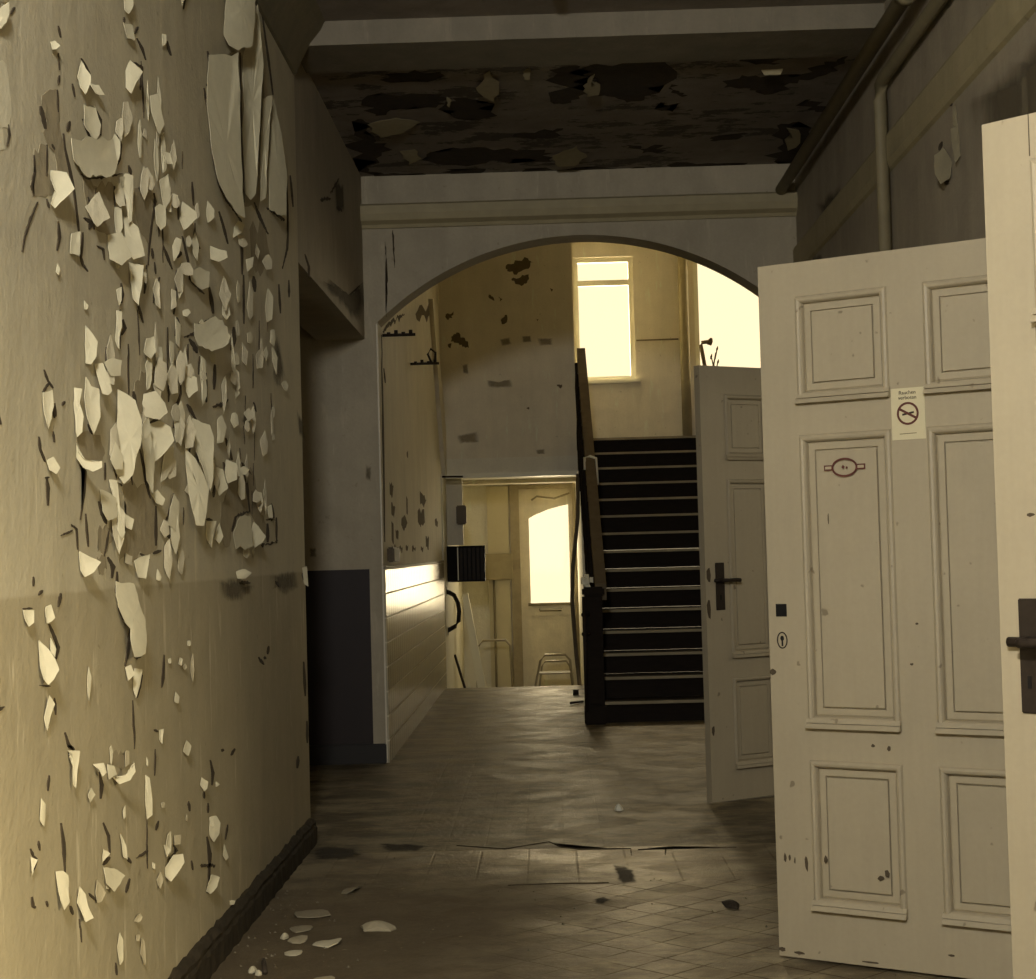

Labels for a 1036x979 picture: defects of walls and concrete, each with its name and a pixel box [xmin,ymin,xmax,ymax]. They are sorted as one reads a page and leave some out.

peeling [0,0,16,29]
peeling [0,60,12,150]
flaking render [345,70,615,176]
flaking render [546,62,687,112]
flaking render [723,56,848,95]
flaking render [764,122,811,164]
flaking render [506,257,531,286]
flaking render [381,304,438,553]
flaking render [275,566,308,591]
crack [457,841,736,855]
crack [508,880,609,888]
peeling [115,932,124,975]